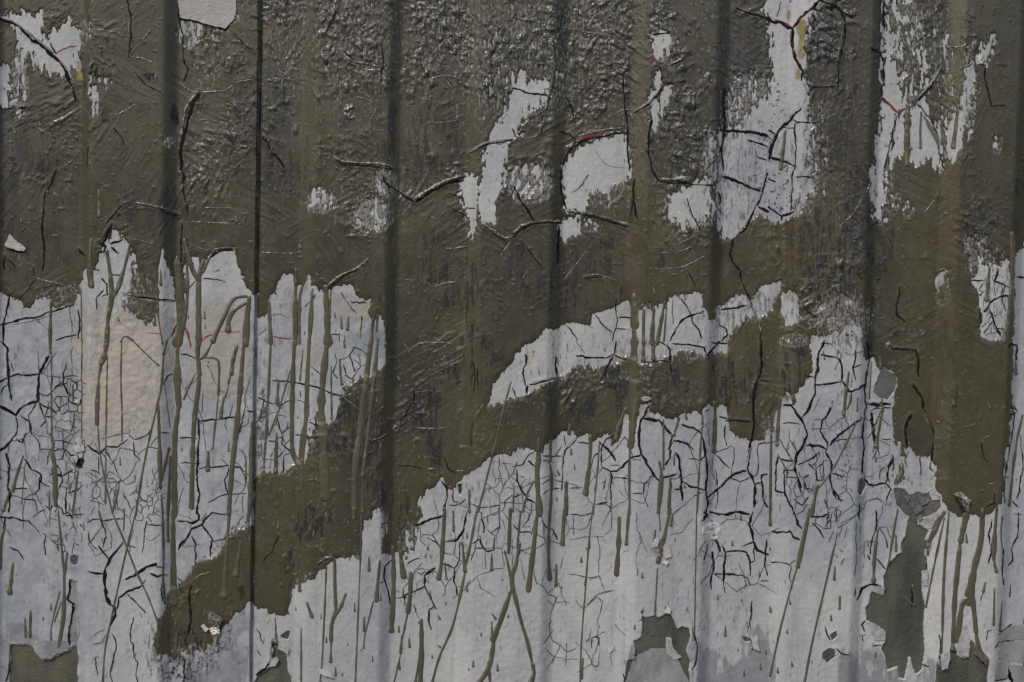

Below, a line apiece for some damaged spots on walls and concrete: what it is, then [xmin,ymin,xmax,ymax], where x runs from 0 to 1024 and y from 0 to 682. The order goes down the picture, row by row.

peeling [4,234,26,253]
crack [0,0,373,682]
crack [332,0,1007,669]
peeling [73,436,85,469]
crack [962,405,1024,601]
peeling [651,538,672,565]
peeling [822,488,1024,682]
peeling [0,579,81,682]
peeling [201,609,223,645]
peeling [255,628,291,682]
peeling [623,604,776,682]
crack [986,624,1014,682]